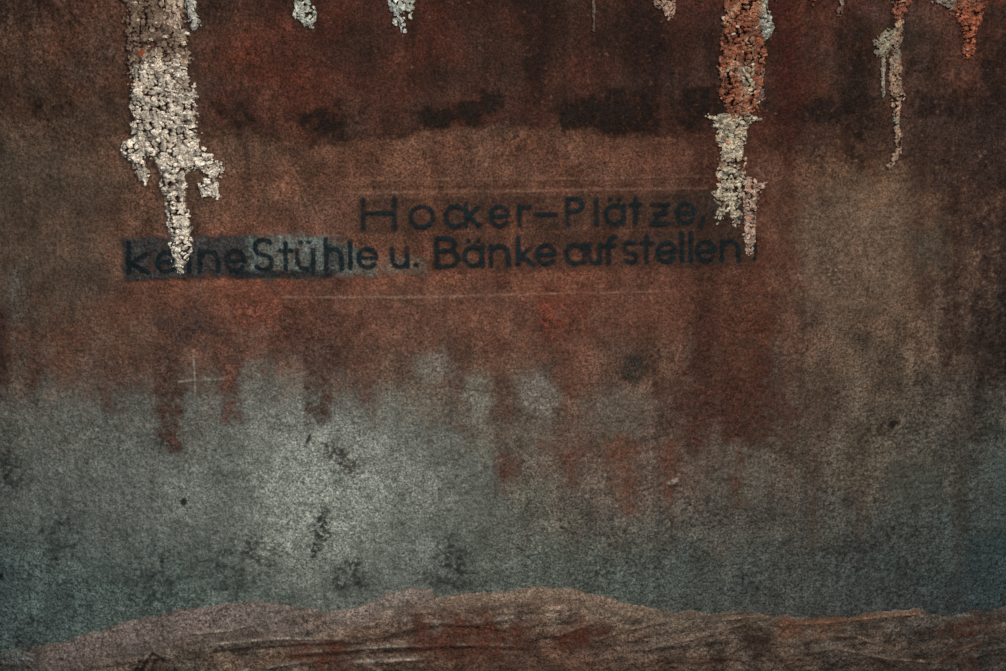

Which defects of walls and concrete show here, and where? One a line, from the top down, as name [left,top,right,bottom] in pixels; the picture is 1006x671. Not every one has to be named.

damp [0,0,1006,386]
damp [325,442,362,478]